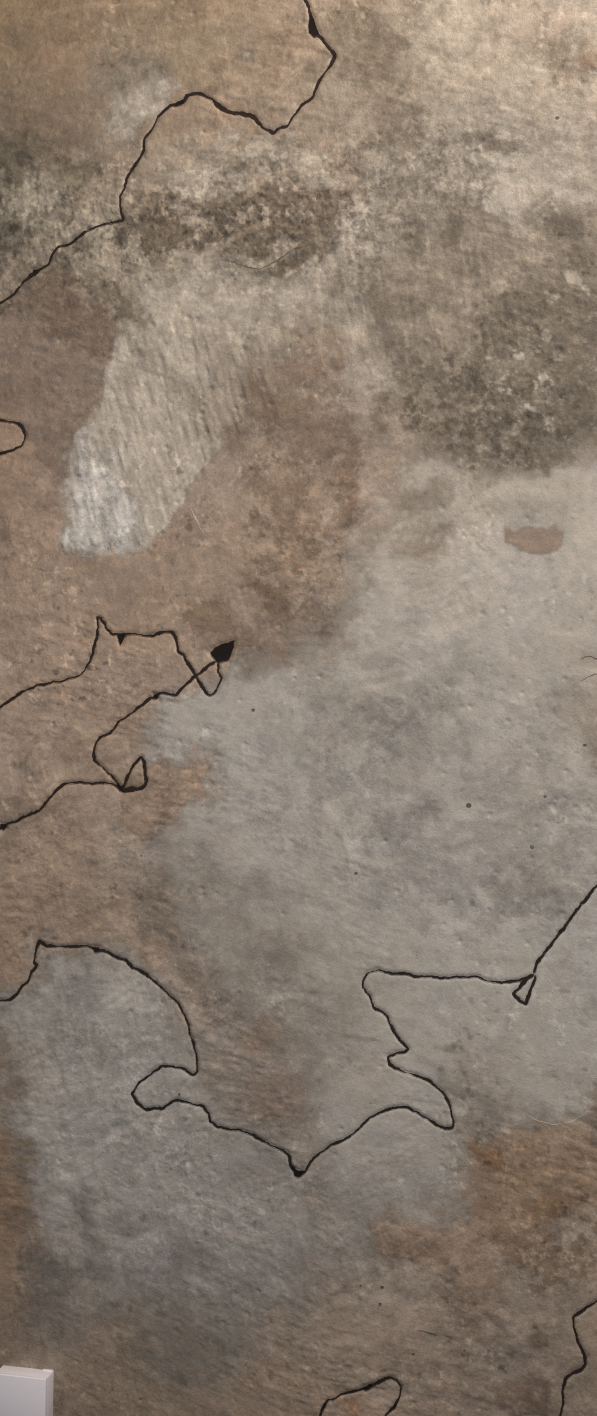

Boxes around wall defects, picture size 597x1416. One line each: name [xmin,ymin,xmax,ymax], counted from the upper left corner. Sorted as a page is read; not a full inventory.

leakage [421,0,487,59]
crack [0,0,336,304]
leakage [115,18,421,277]
leakage [424,129,515,164]
crack [0,419,26,455]
leakage [227,328,355,462]
leakage [338,192,597,476]
crack [0,616,235,830]
crack [0,885,597,1177]
crack [319,1376,402,1416]
crack [559,1300,597,1416]